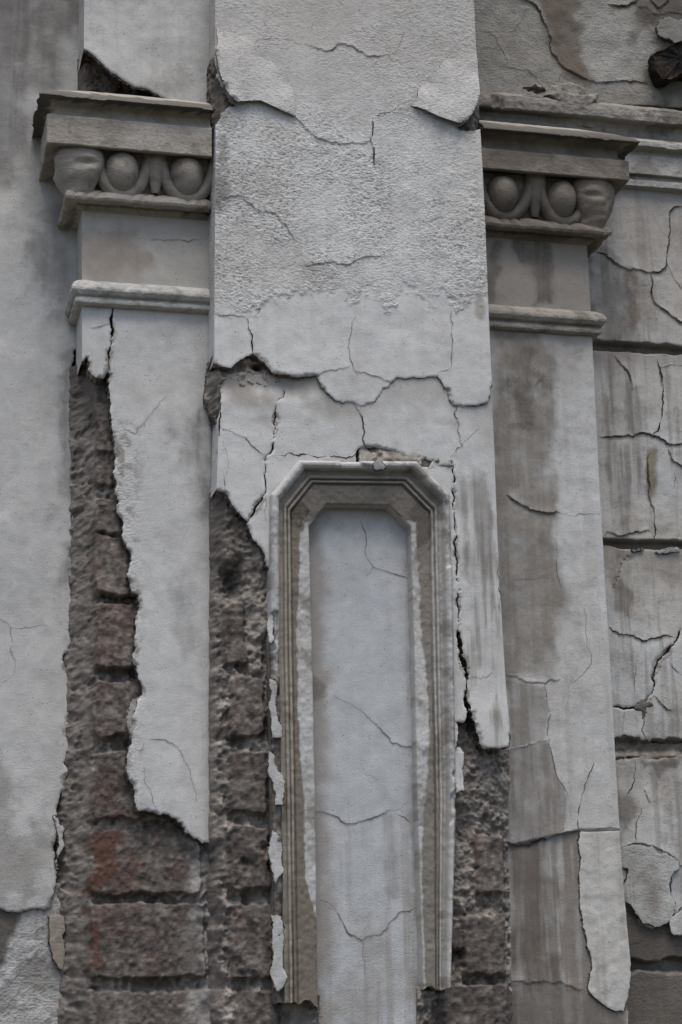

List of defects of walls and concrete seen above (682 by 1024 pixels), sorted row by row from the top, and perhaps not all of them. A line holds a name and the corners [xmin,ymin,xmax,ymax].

spalling [47,355,561,1024]